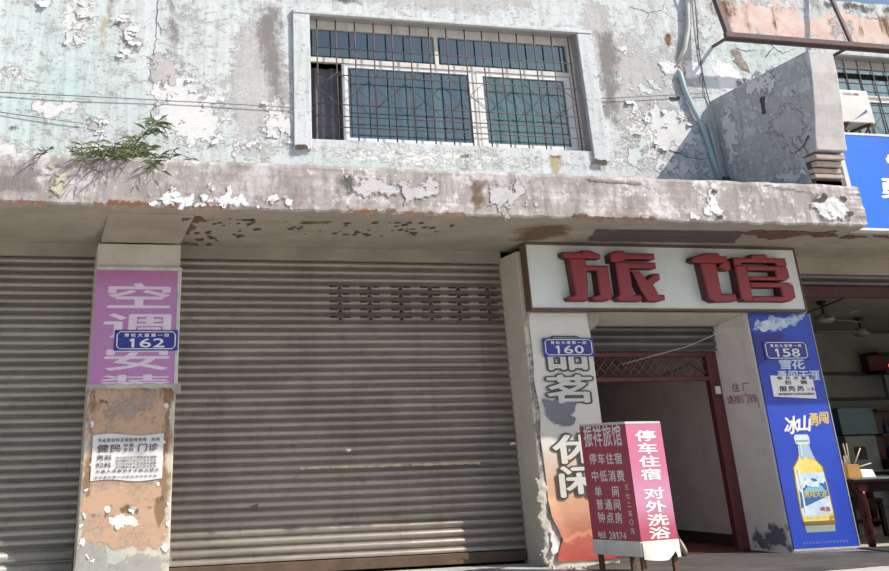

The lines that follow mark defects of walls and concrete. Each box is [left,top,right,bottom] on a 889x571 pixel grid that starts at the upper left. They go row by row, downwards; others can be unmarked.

peeling [64,0,96,48]
peeling [111,14,308,162]
damp [257,6,283,104]
peeling [598,47,782,220]
peeling [94,183,294,246]
peeling [332,165,465,237]
peeling [487,179,540,221]
spalling [740,154,889,240]
peeling [75,388,174,571]